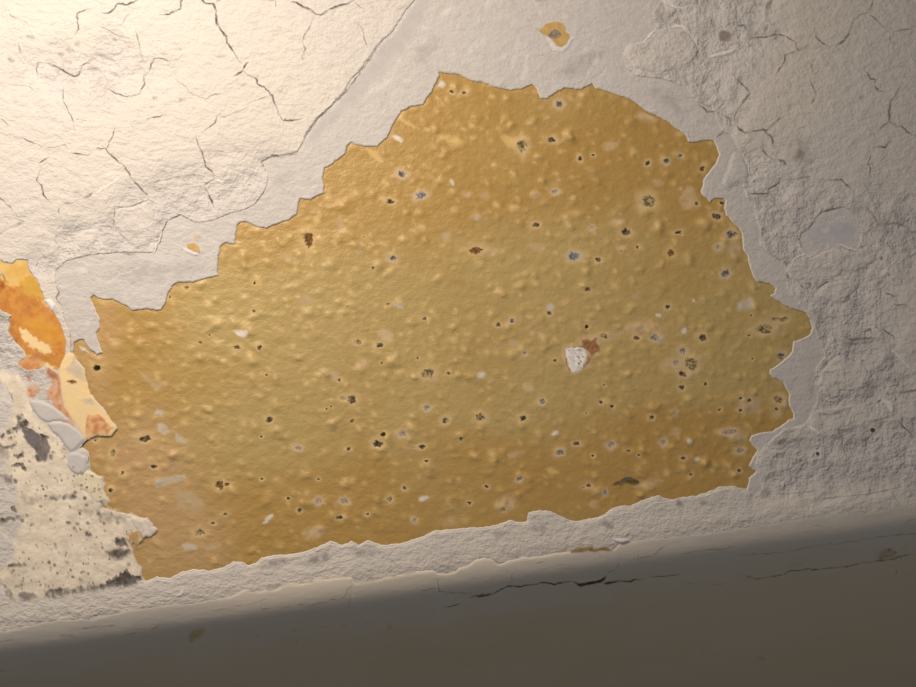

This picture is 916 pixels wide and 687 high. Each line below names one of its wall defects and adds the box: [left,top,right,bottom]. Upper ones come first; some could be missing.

crack [18,45,86,121]
crack [1,116,226,227]
crack [76,0,168,97]
crack [165,0,376,136]
crack [701,80,807,195]
crack [738,1,849,72]
crack [867,72,916,175]
corrosion [0,260,74,427]
peeling [0,0,824,600]
leakage [0,413,65,483]
leakage [3,468,141,599]
crack [421,547,729,608]